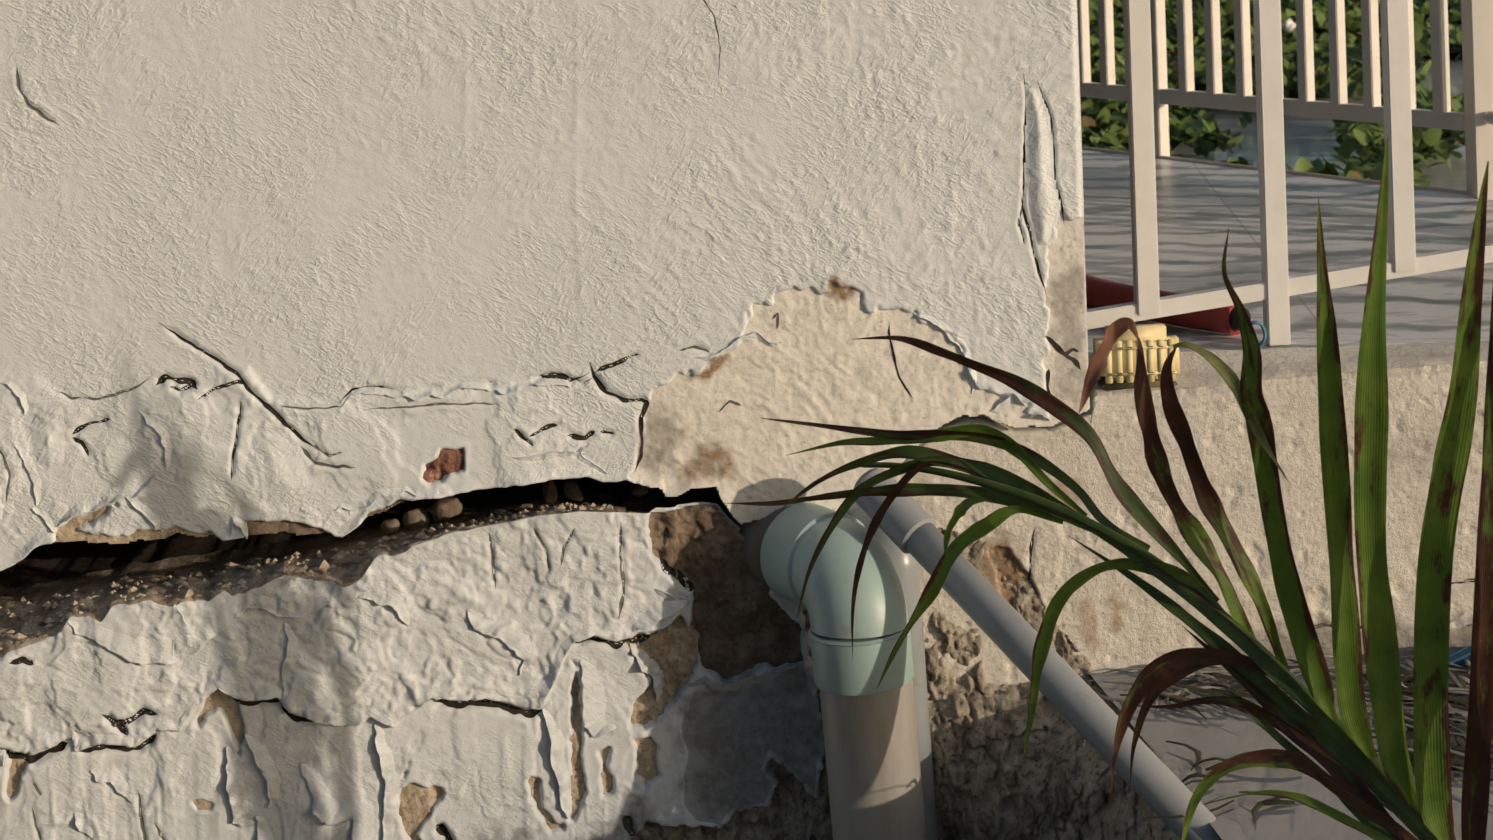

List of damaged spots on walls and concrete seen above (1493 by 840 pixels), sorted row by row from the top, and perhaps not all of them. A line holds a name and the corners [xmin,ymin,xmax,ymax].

crack [16,65,57,124]
crack [703,0,721,78]
crack [1017,73,1065,296]
crack [0,322,721,649]
flaking render [0,211,1089,840]
crack [719,400,741,412]
crack [9,656,34,666]
crack [434,699,542,718]
peeling [937,528,1159,758]
peeling [923,611,1180,840]